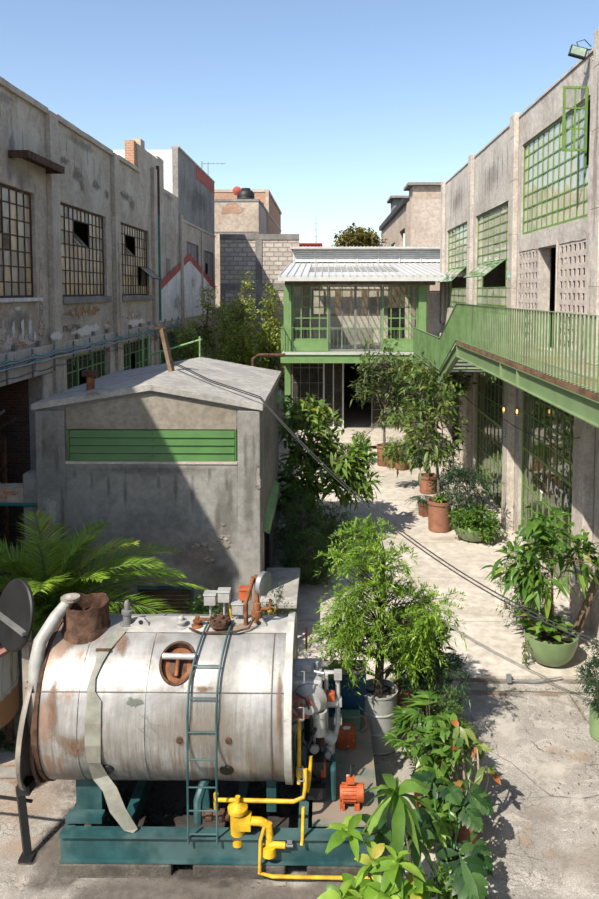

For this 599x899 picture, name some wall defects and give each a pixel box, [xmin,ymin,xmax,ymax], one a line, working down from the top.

flaking render [0,303,36,351]
flaking render [51,303,111,341]
crack [443,690,597,769]
crack [492,739,599,799]
crack [478,826,554,885]